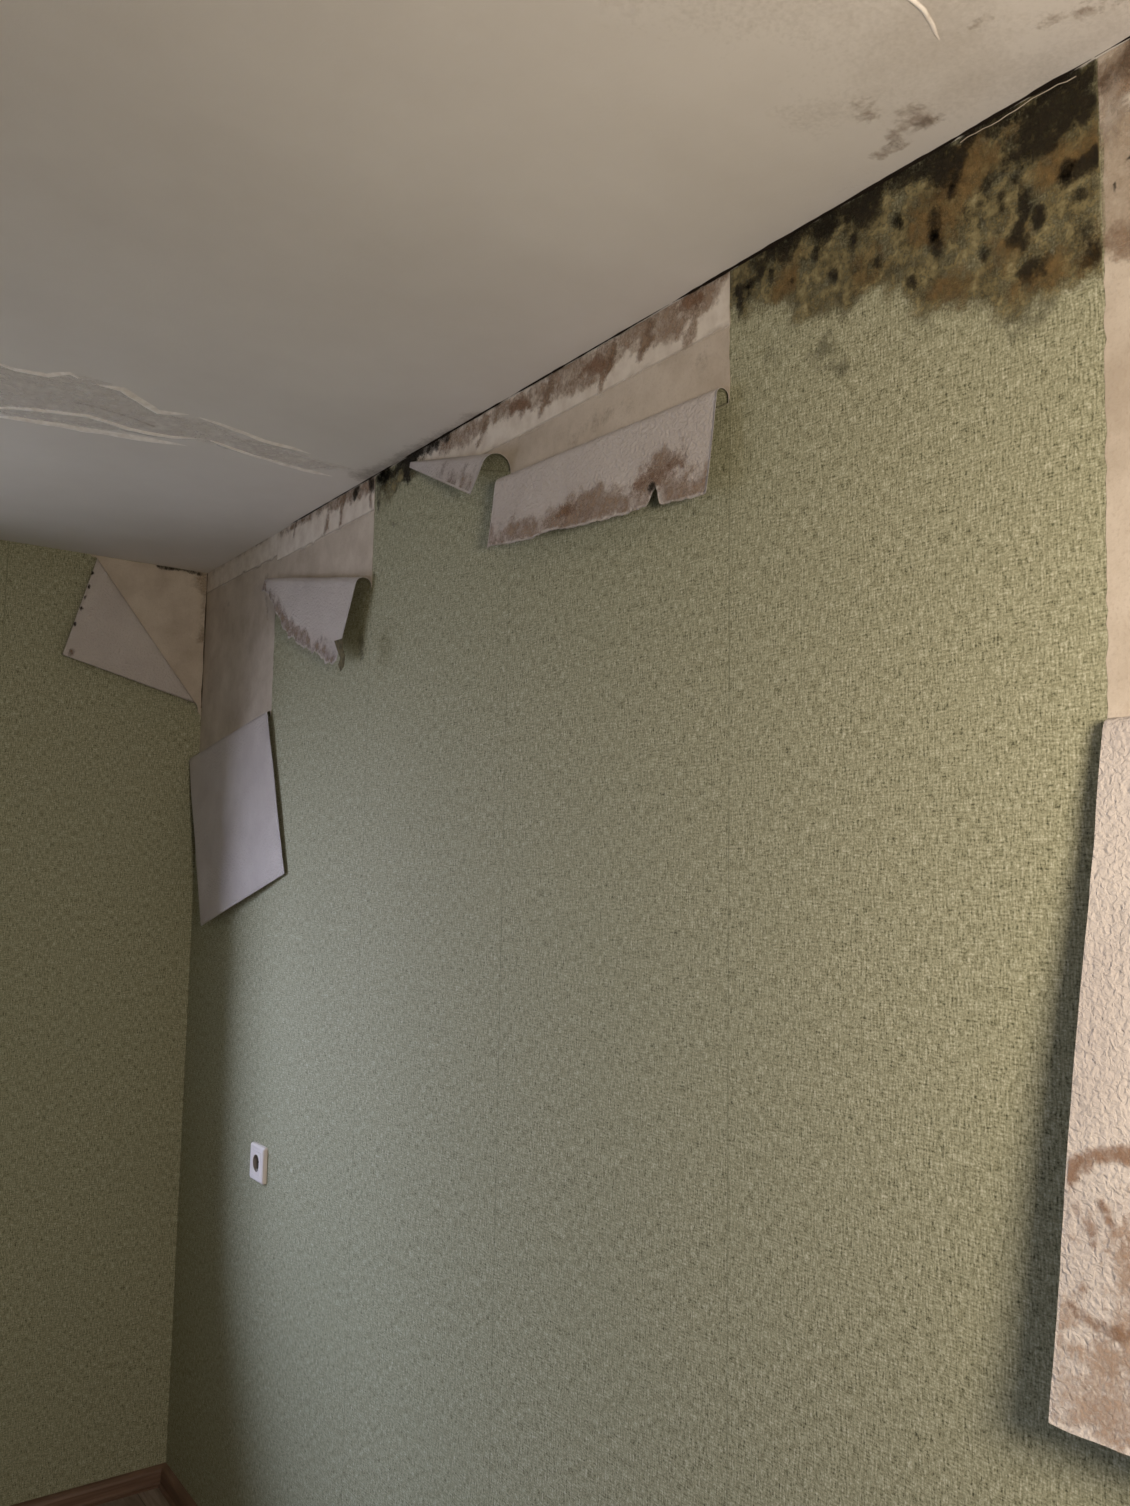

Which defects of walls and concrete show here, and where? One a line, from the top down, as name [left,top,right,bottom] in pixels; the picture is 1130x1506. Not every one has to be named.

flaking render [416,271,731,473]
leakage [280,39,1130,544]
flaking render [90,477,376,753]
leakage [1067,1147,1130,1182]